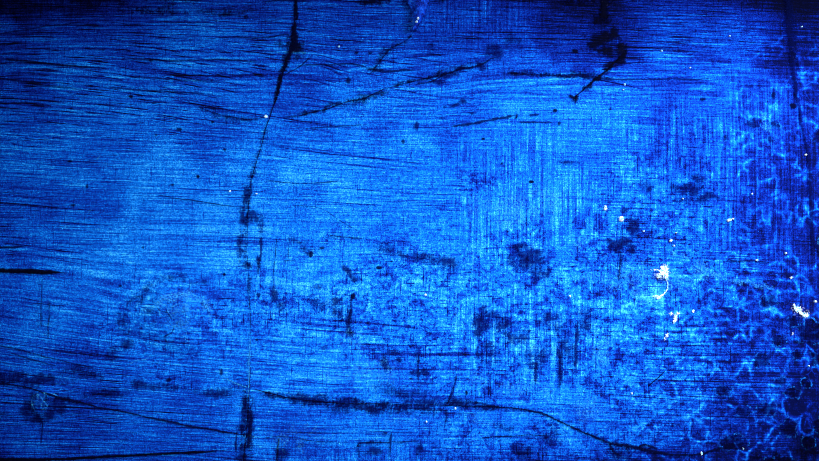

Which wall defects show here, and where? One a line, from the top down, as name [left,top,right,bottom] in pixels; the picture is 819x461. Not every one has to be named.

crack [246,0,296,228]
crack [569,52,626,98]
crack [0,302,723,459]